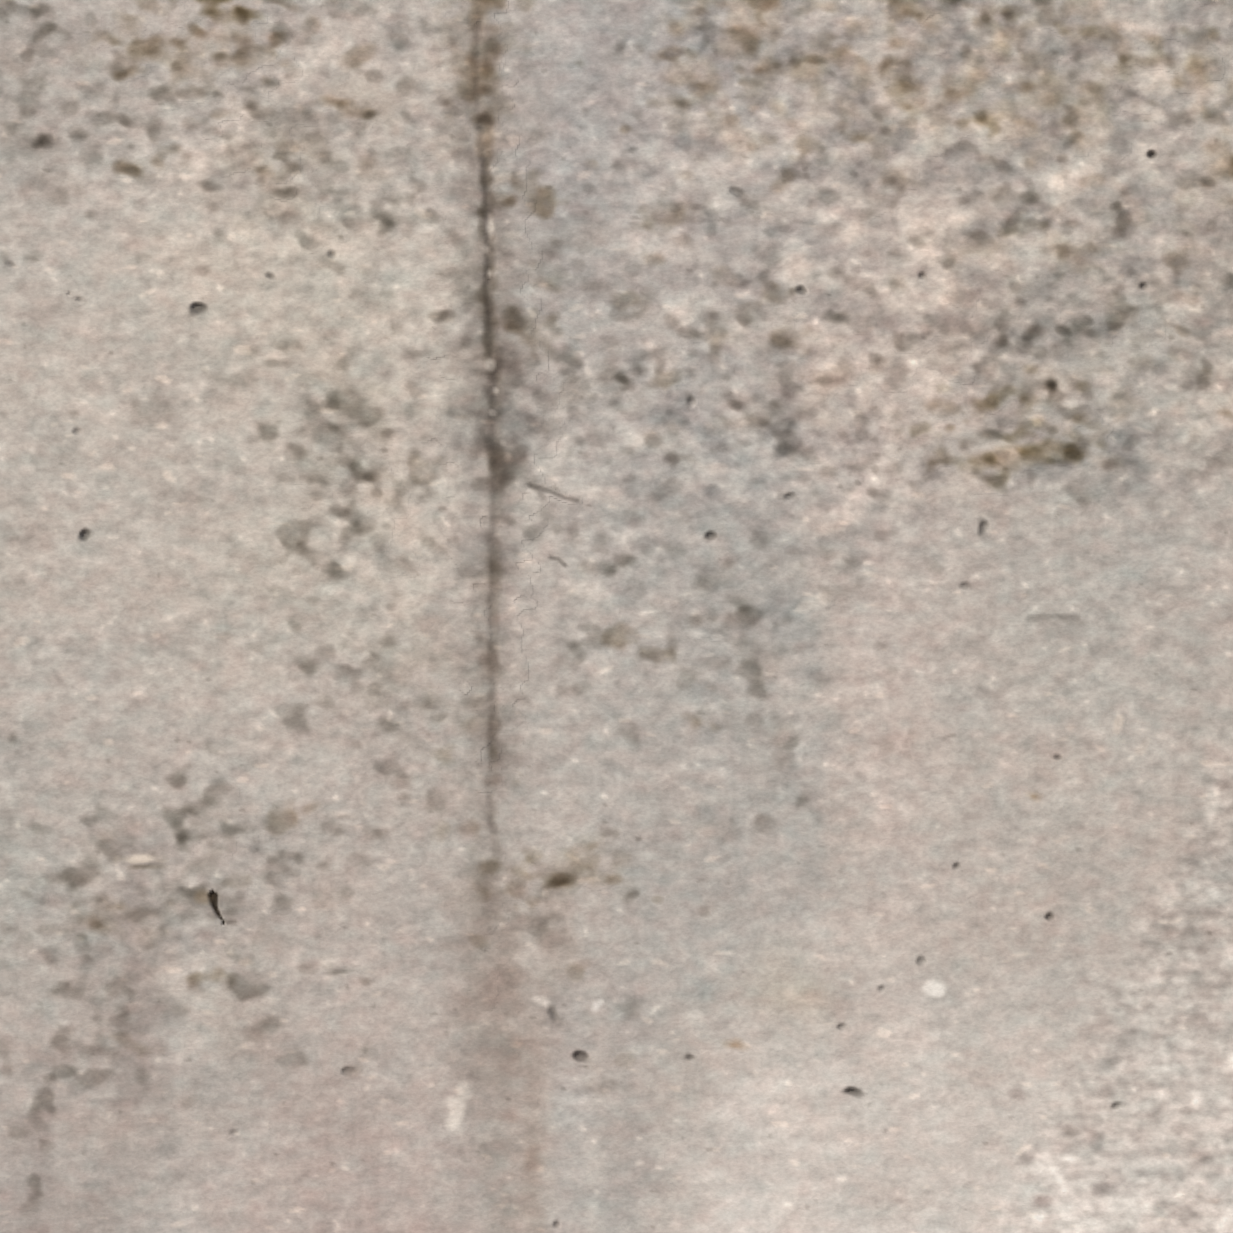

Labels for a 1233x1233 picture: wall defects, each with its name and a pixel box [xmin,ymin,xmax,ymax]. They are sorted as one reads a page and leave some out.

crack [418,0,582,1011]